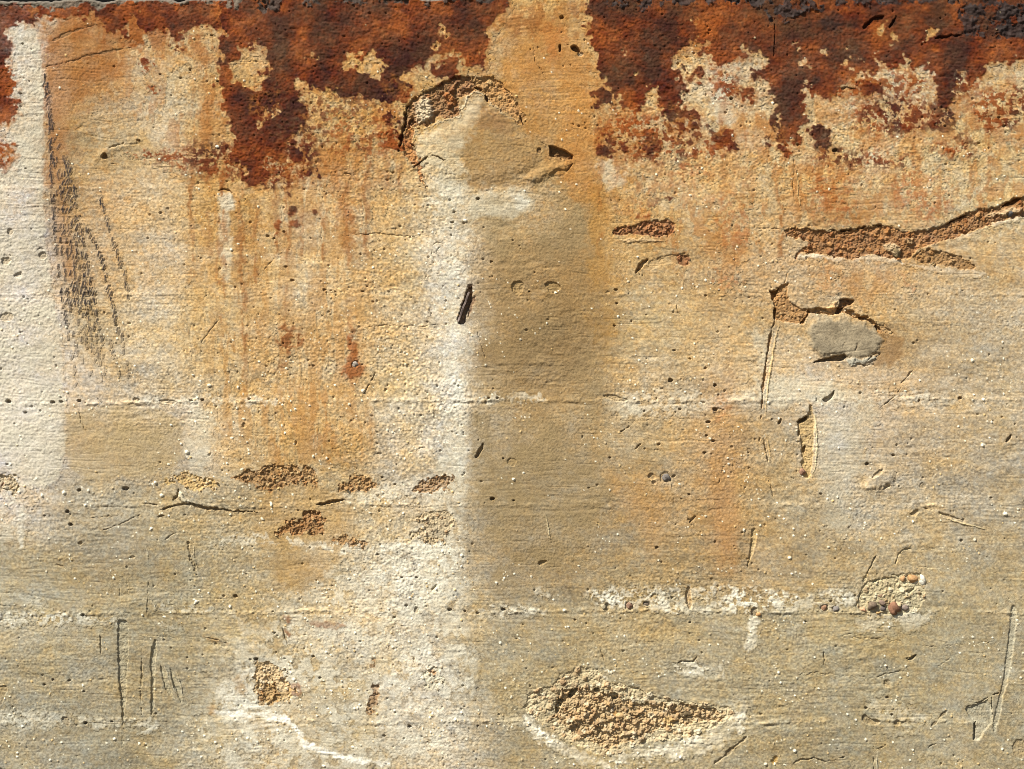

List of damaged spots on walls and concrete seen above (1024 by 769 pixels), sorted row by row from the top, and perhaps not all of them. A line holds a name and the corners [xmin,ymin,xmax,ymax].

spalling [403,76,527,185]
spalling [613,219,692,274]
spalling [757,197,1024,271]
corrosion [0,0,1024,607]
spalling [769,283,895,336]
spalling [164,463,319,494]
spalling [411,474,456,496]
spalling [274,510,369,551]
spalling [250,658,300,707]
spalling [523,666,736,758]